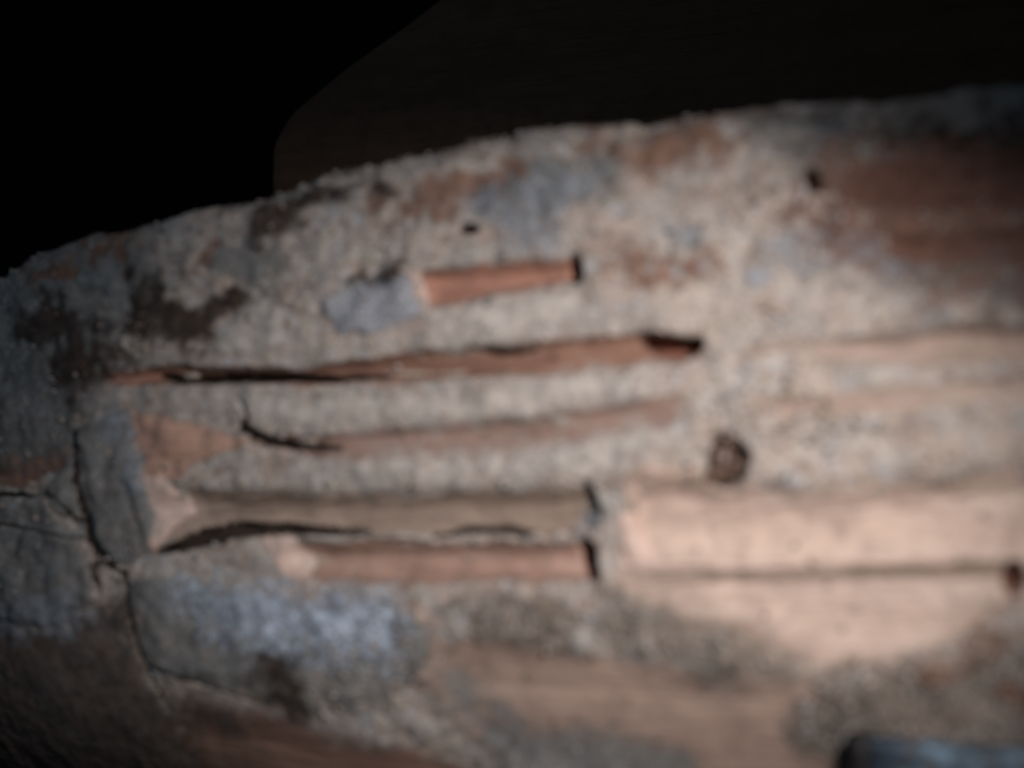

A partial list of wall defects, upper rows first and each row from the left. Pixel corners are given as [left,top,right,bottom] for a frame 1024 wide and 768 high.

spalling [99,325,704,397]
spalling [398,258,584,316]
crack [0,429,256,703]
crack [152,519,371,555]
spalling [137,393,682,597]
spalling [618,458,1024,672]